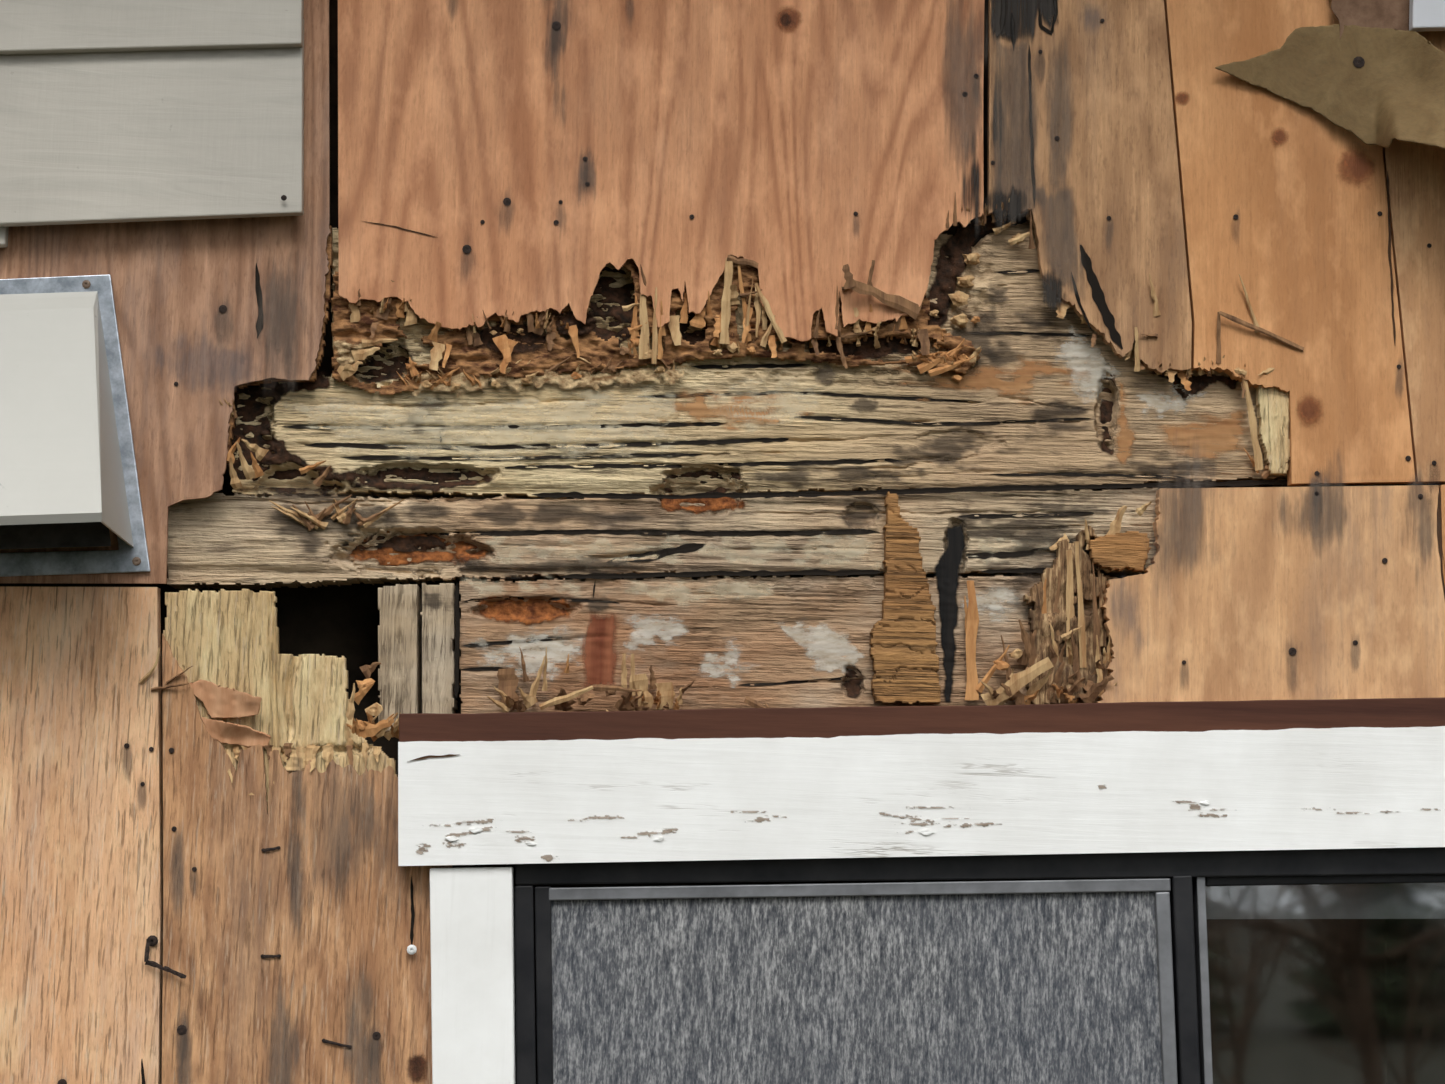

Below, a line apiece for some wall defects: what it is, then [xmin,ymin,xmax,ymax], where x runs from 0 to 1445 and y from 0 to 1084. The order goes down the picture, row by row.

peeling [349,280,580,374]
peeling [651,285,792,358]
peeling [811,304,931,368]
peeling [1056,302,1097,347]
peeling [931,361,1071,395]
peeling [1168,362,1208,391]
peeling [671,391,779,430]
peeling [416,819,553,862]
peeling [621,828,678,841]
peeling [880,806,1001,835]
peeling [1175,800,1227,817]
water stain [174,846,183,898]